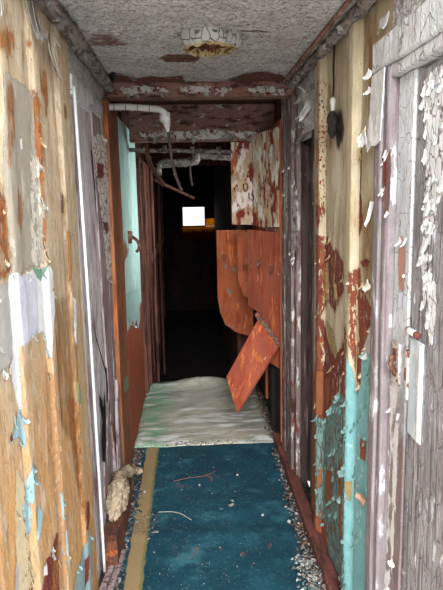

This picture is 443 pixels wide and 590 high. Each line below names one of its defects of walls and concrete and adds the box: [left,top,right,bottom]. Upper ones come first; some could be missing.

rust [0,28,15,57]
rust [31,71,48,199]
peeling [140,129,259,144]
peeling [357,67,385,152]
peeling [0,71,57,449]
peeling [126,290,140,329]
peeling [416,64,443,346]
peeling [311,201,371,590]
peeling [15,462,43,590]